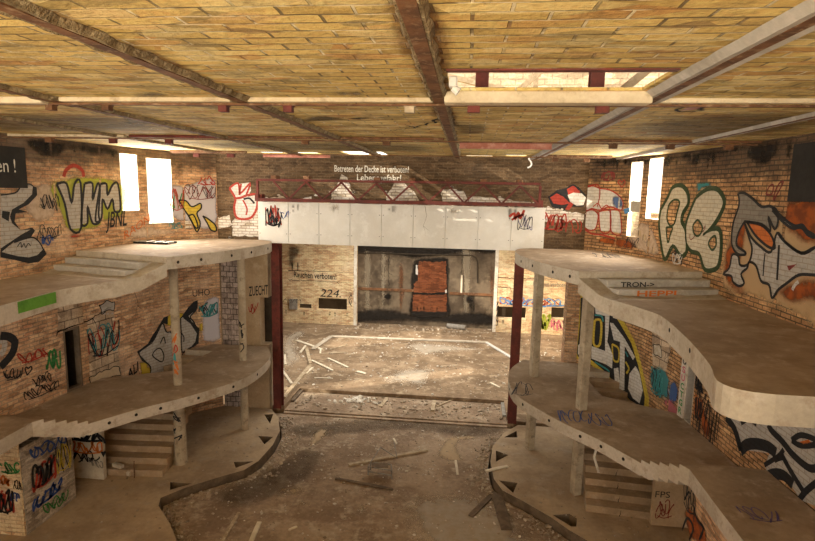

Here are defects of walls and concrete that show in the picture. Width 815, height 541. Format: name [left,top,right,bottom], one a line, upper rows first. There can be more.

damp [29,140,119,157]
damp [740,141,791,164]
damp [347,246,496,325]